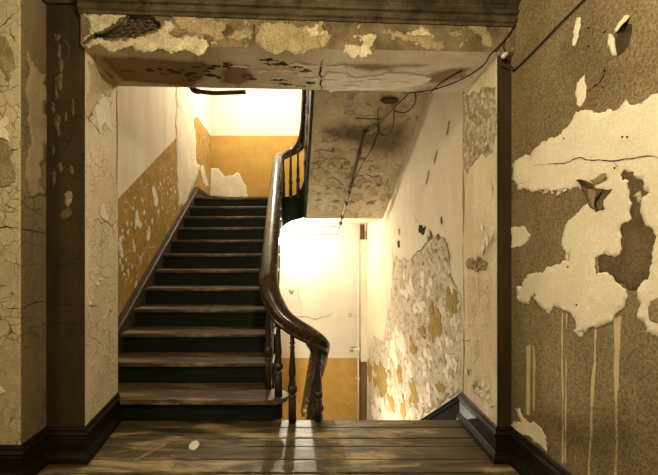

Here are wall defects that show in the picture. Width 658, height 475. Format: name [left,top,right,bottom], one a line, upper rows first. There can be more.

peeling [608,15,632,57]
peeling [24,34,75,198]
peeling [82,13,432,277]
peeling [463,86,498,173]
peeling [511,75,658,337]
crack [535,155,657,167]
crack [2,219,115,350]
peeling [368,223,494,420]
peeling [511,408,547,452]
damp [526,344,536,415]
damp [588,329,597,475]
damp [614,315,622,475]